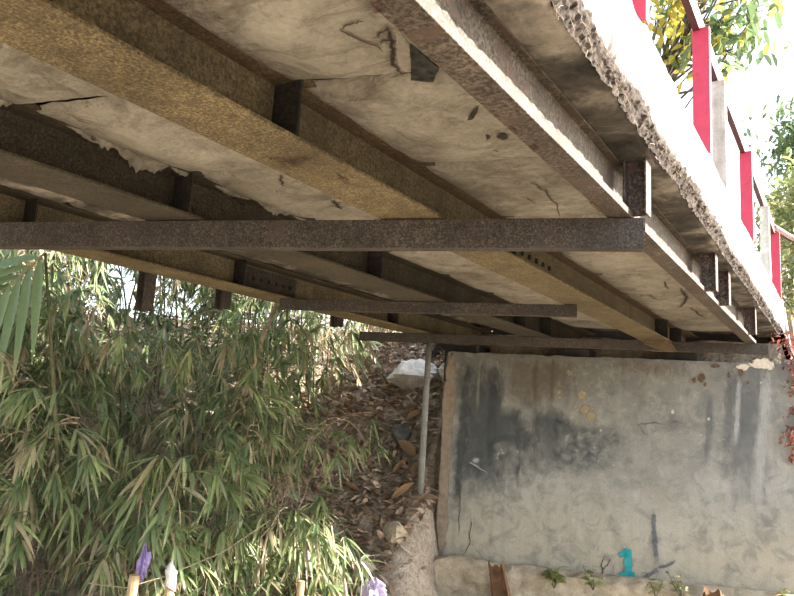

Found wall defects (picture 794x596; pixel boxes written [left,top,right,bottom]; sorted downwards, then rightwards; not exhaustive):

crack [340,21,403,77]
peeling [66,125,188,177]
spalling [728,358,774,384]
damp [436,353,657,552]
damp [708,386,740,442]
damp [757,381,769,480]